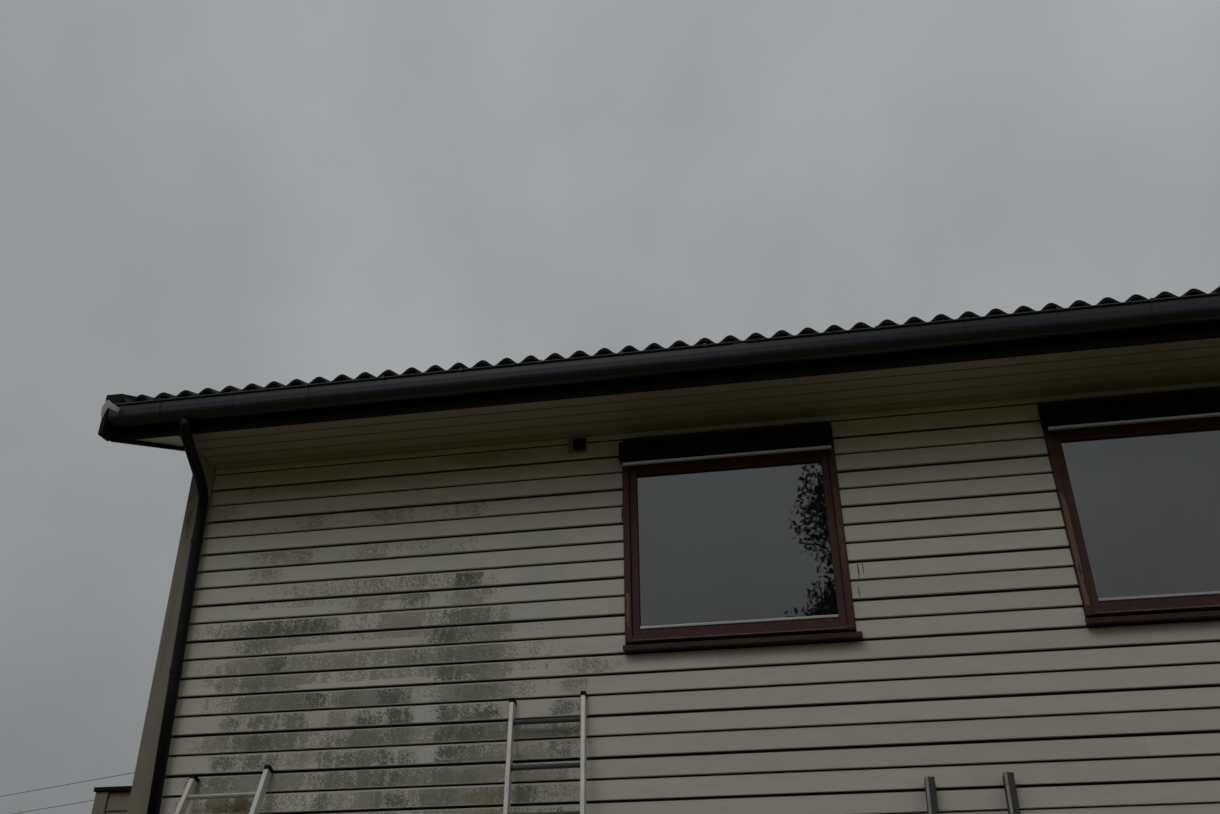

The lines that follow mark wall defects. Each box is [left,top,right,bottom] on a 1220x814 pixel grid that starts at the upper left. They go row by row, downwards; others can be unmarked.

water stain [183,538,622,814]
water stain [515,530,575,546]